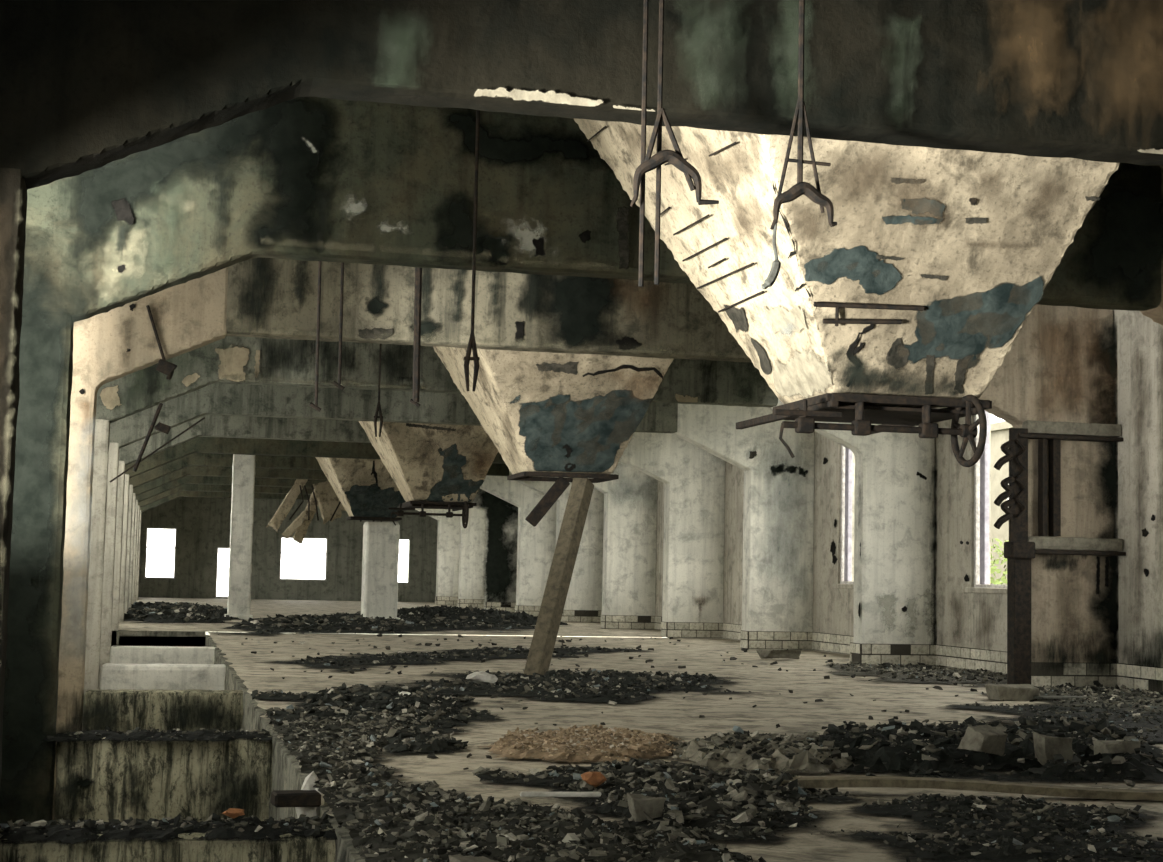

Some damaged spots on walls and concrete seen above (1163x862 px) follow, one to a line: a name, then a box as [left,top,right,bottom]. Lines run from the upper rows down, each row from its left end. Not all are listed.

water stain [346,198,365,213]
water stain [515,223,544,251]
spalling [358,328,393,339]
water stain [366,264,388,316]
water stain [410,268,467,342]
water stain [490,272,499,315]
spalling [515,321,524,343]
water stain [519,274,624,348]
spalling [696,258,754,289]
flaking render [718,246,1044,398]
flaking render [536,361,663,385]
flaking render [510,390,654,473]